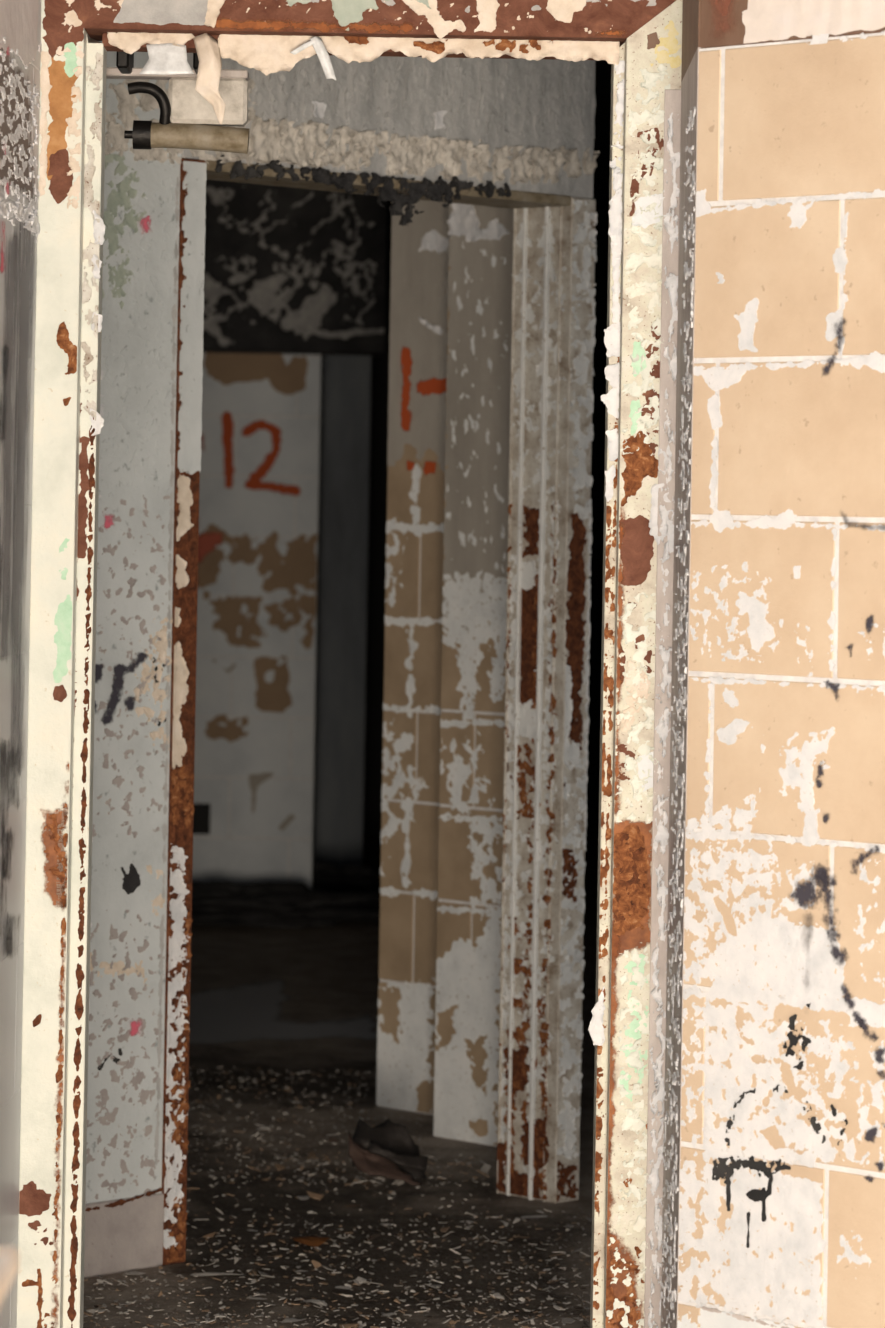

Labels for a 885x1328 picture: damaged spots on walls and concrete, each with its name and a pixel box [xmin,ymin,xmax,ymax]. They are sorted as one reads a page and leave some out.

rust [42,0,119,58]
rust [215,18,448,54]
rust [483,39,553,53]
rust [647,32,660,50]
rust [48,149,73,204]
rust [629,127,664,216]
rust [19,322,96,1328]
rust [171,765,194,829]
rust [496,503,587,1201]
rust [593,325,661,1328]
peeling [86,827,190,1249]
rust [170,912,193,1150]